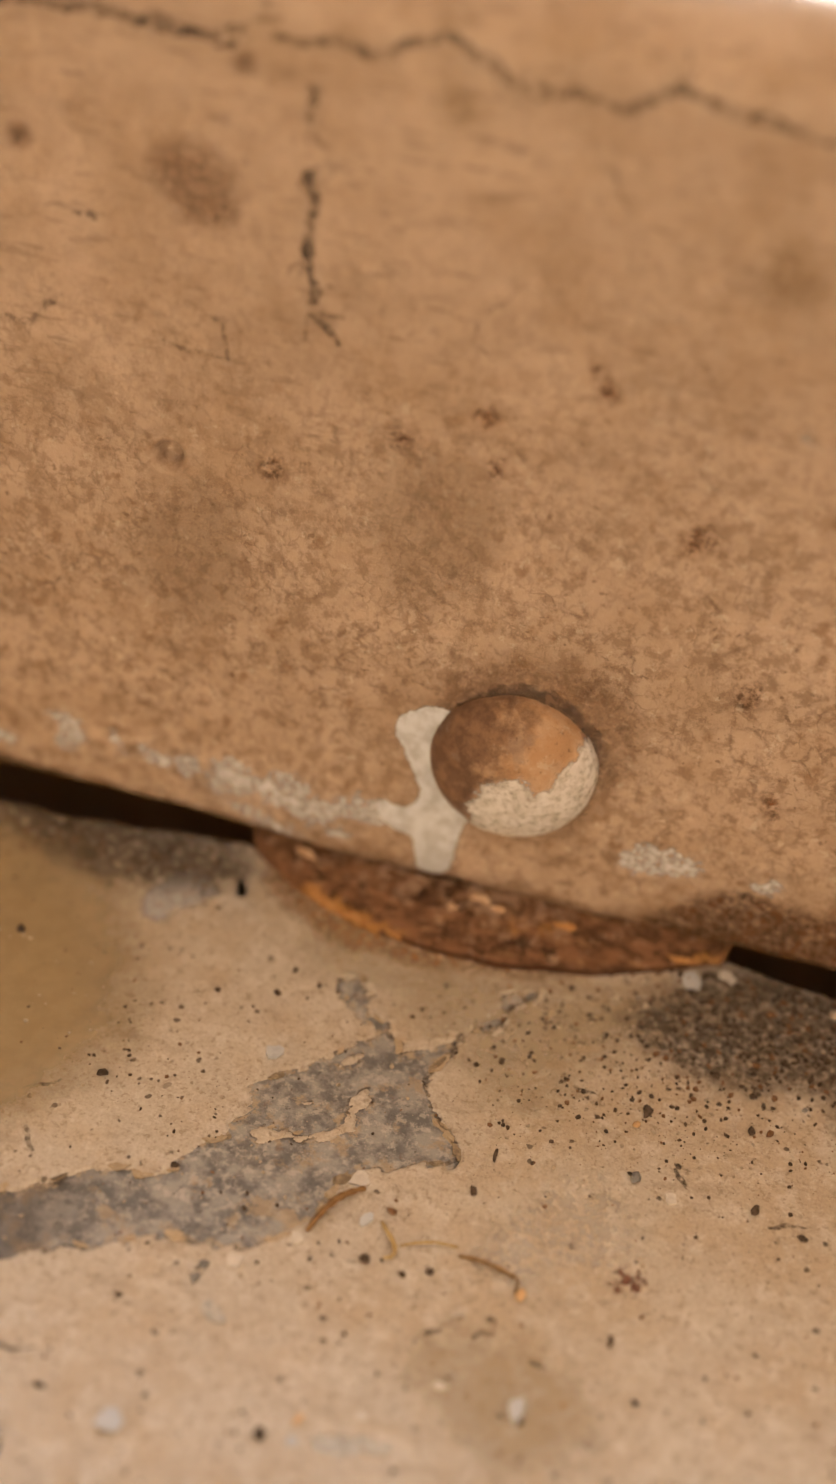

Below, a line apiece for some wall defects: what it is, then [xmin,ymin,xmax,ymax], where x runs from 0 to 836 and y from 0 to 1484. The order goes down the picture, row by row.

crack [0,0,830,145]
crack [301,169,340,347]
peeling [0,974,538,1268]